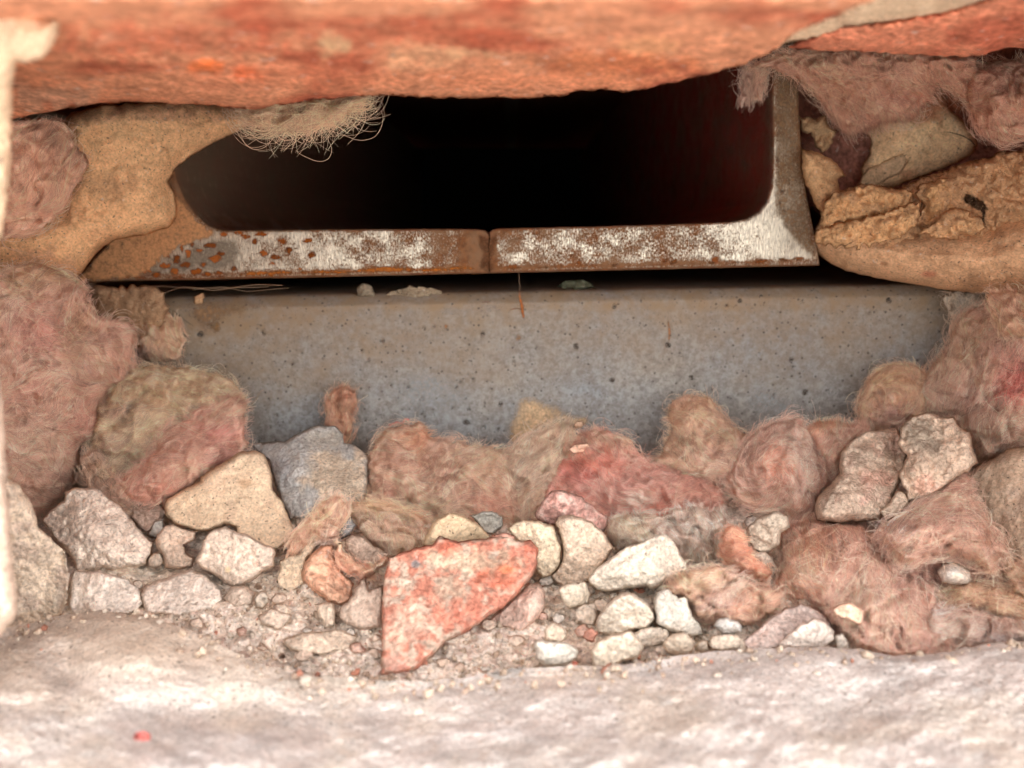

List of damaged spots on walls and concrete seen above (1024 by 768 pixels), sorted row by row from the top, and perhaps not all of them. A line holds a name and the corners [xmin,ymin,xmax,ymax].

rust [125,231,496,279]